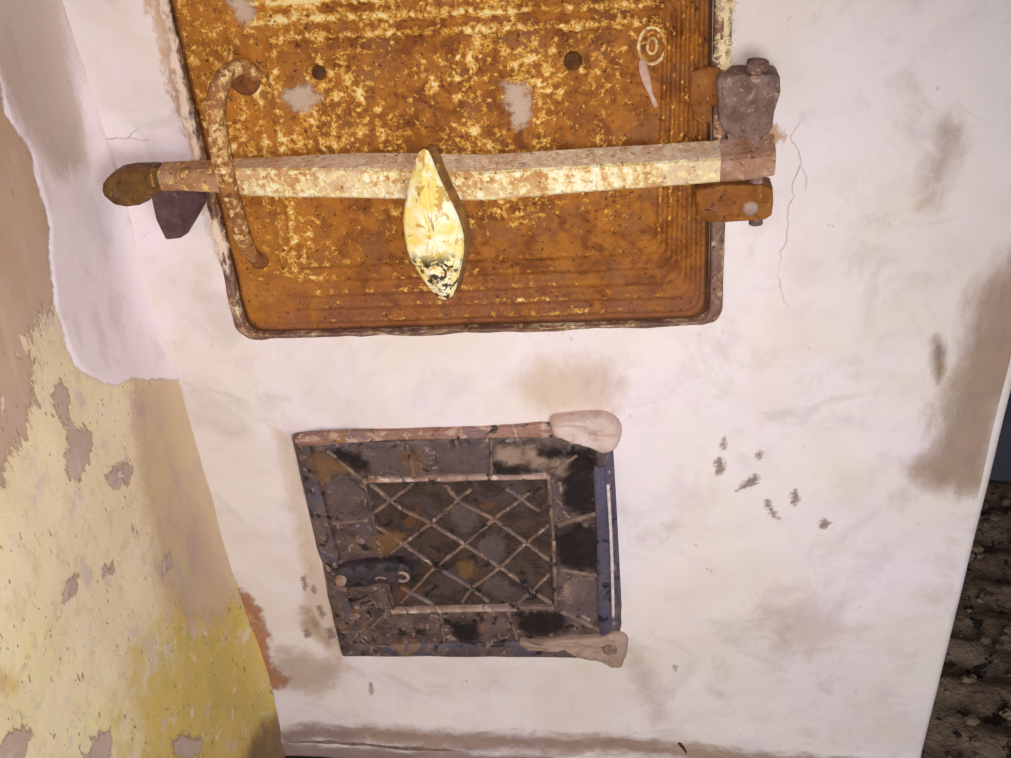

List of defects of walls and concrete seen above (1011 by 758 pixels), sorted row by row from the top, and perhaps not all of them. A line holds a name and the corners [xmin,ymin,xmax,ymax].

rust [145,0,192,150]
crack [778,108,807,310]
damp [917,275,1011,487]
flaking render [238,588,289,690]
damp [250,720,776,758]